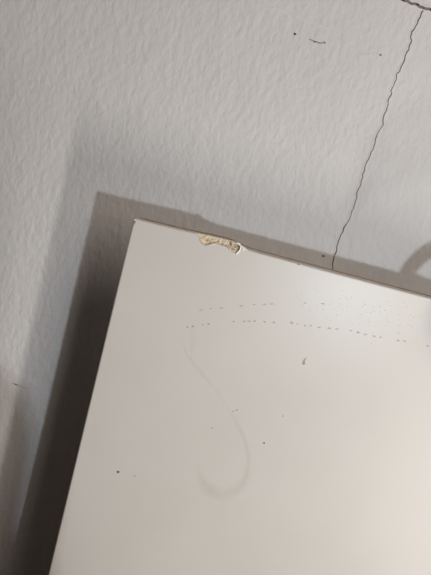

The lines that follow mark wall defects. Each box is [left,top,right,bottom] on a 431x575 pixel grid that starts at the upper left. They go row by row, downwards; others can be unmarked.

spalling [196,233,247,254]
crack [330,0,431,270]